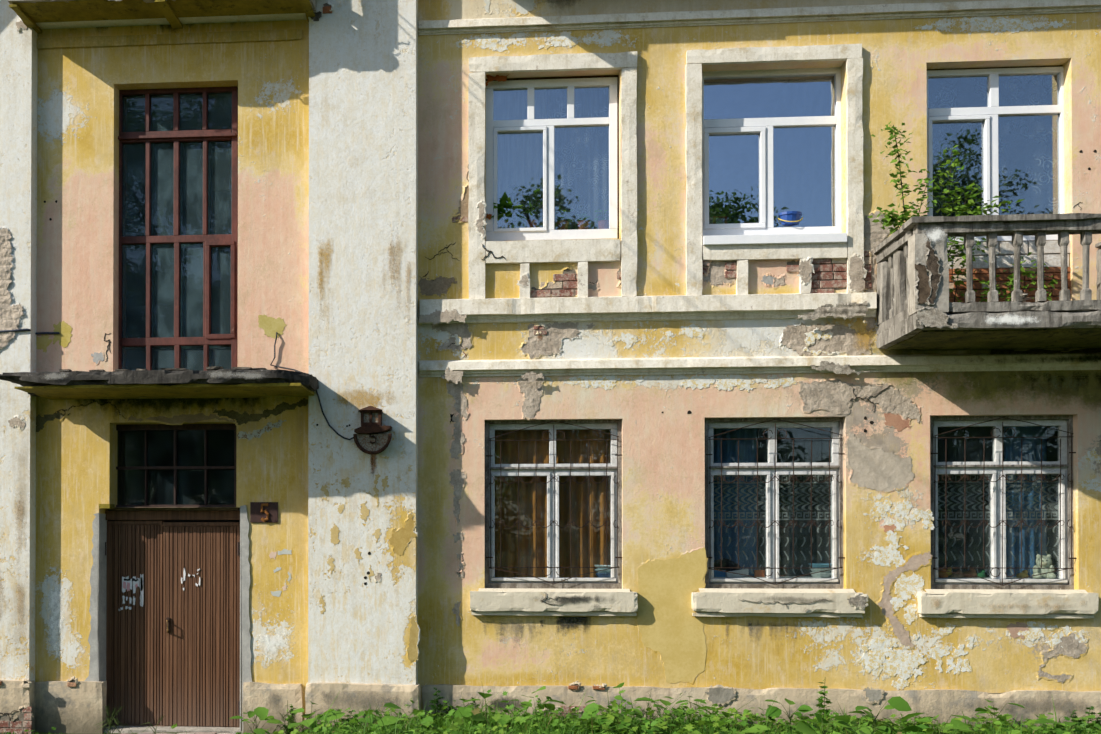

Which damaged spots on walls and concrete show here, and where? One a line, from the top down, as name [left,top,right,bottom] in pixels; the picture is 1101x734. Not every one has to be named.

flaking render [0,226,39,352]
flaking render [418,275,459,299]
crack [423,227,506,281]
flaking render [517,266,600,297]
flaking render [761,210,898,293]
spalling [913,232,958,330]
flaking render [519,321,597,360]
peeling [607,332,638,349]
flaking render [779,317,877,356]
flaking render [680,374,923,431]
flaking render [845,433,974,704]
flaking render [1006,621,1089,684]